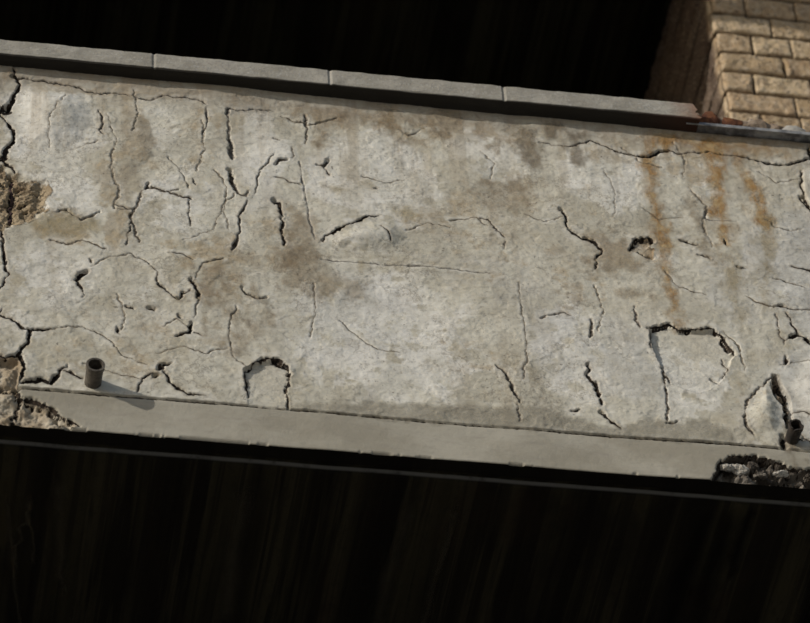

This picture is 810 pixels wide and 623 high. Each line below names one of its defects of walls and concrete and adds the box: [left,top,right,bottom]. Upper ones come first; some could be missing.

water stain [519,128,540,167]
spalling [0,164,52,232]
corrosion [698,140,727,242]
corrosion [745,177,769,229]
crack [0,68,810,453]
spalling [0,357,80,430]
spalling [712,455,810,489]